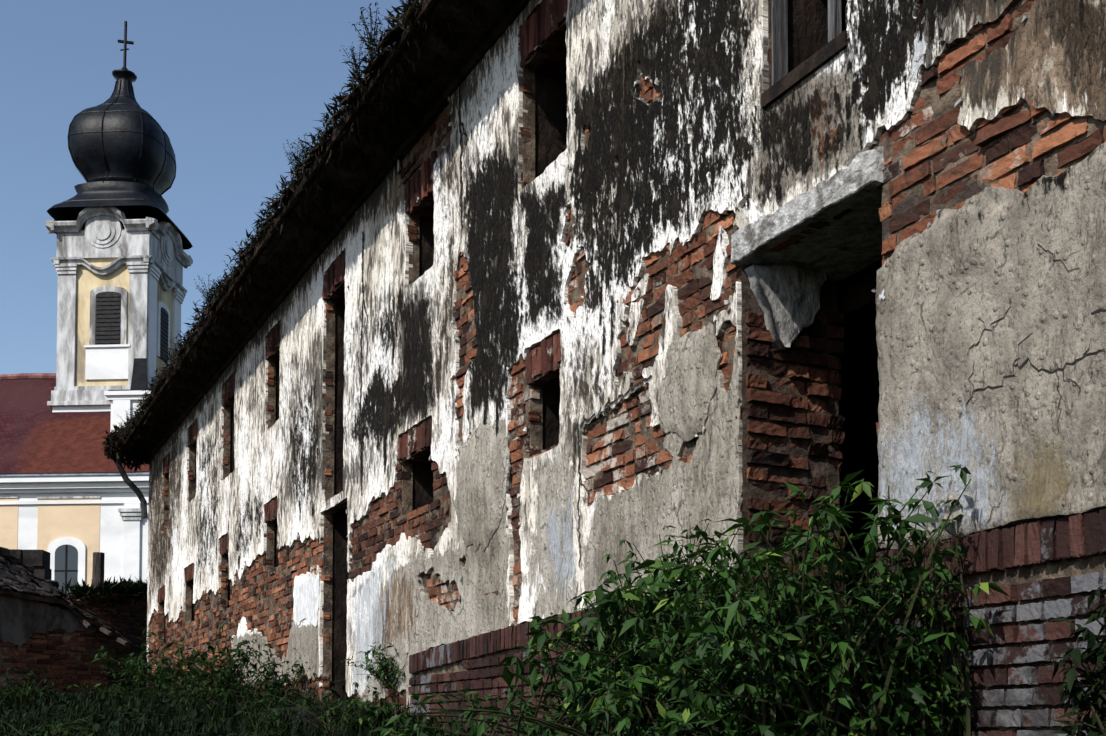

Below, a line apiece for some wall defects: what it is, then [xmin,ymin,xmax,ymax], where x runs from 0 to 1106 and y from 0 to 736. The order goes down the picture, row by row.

water stain [1030,0,1106,97]
water stain [350,0,975,494]
spalling [871,0,1106,266]
water stain [1007,166,1075,209]
crack [1038,244,1080,272]
spalling [451,253,478,458]
spalling [579,189,861,504]
crack [958,306,1106,431]
spalling [324,449,451,582]
water stain [547,491,579,592]
water stain [878,401,1067,529]
spalling [148,534,330,687]